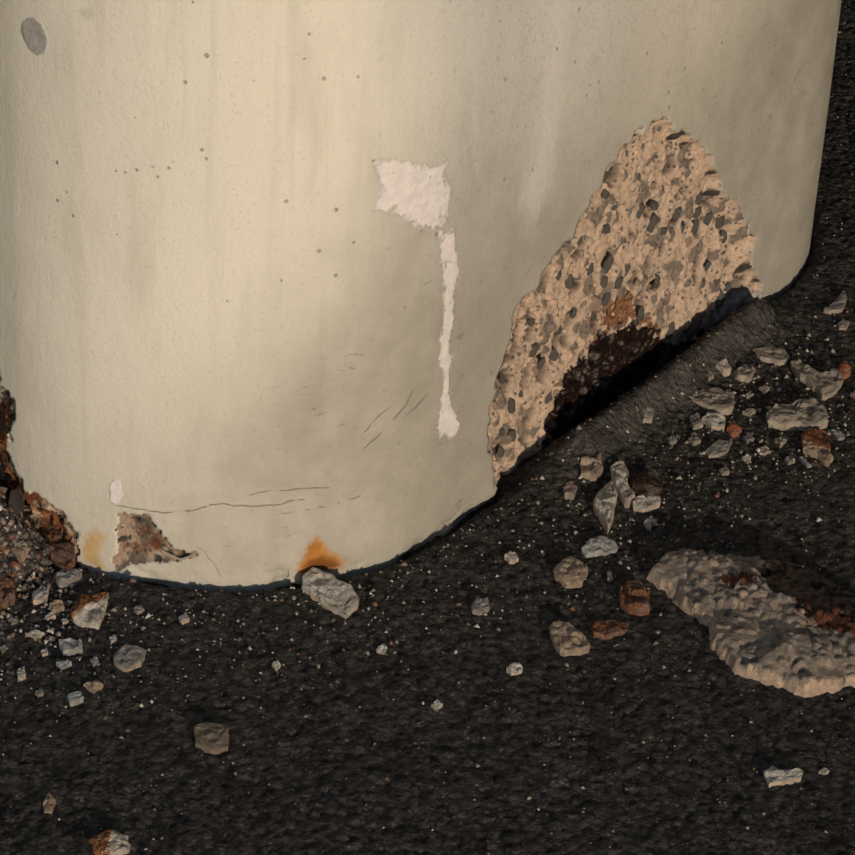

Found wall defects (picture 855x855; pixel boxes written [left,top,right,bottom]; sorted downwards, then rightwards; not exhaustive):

corrosion [0,390,26,503]
spalling [0,377,109,630]
spalling [108,477,198,572]
crack [121,487,360,514]
corrosion [289,530,356,585]
corrosion [543,287,704,441]
spalling [487,119,765,503]
peeling [688,358,855,476]
peeling [25,629,48,657]
peeling [56,638,99,670]